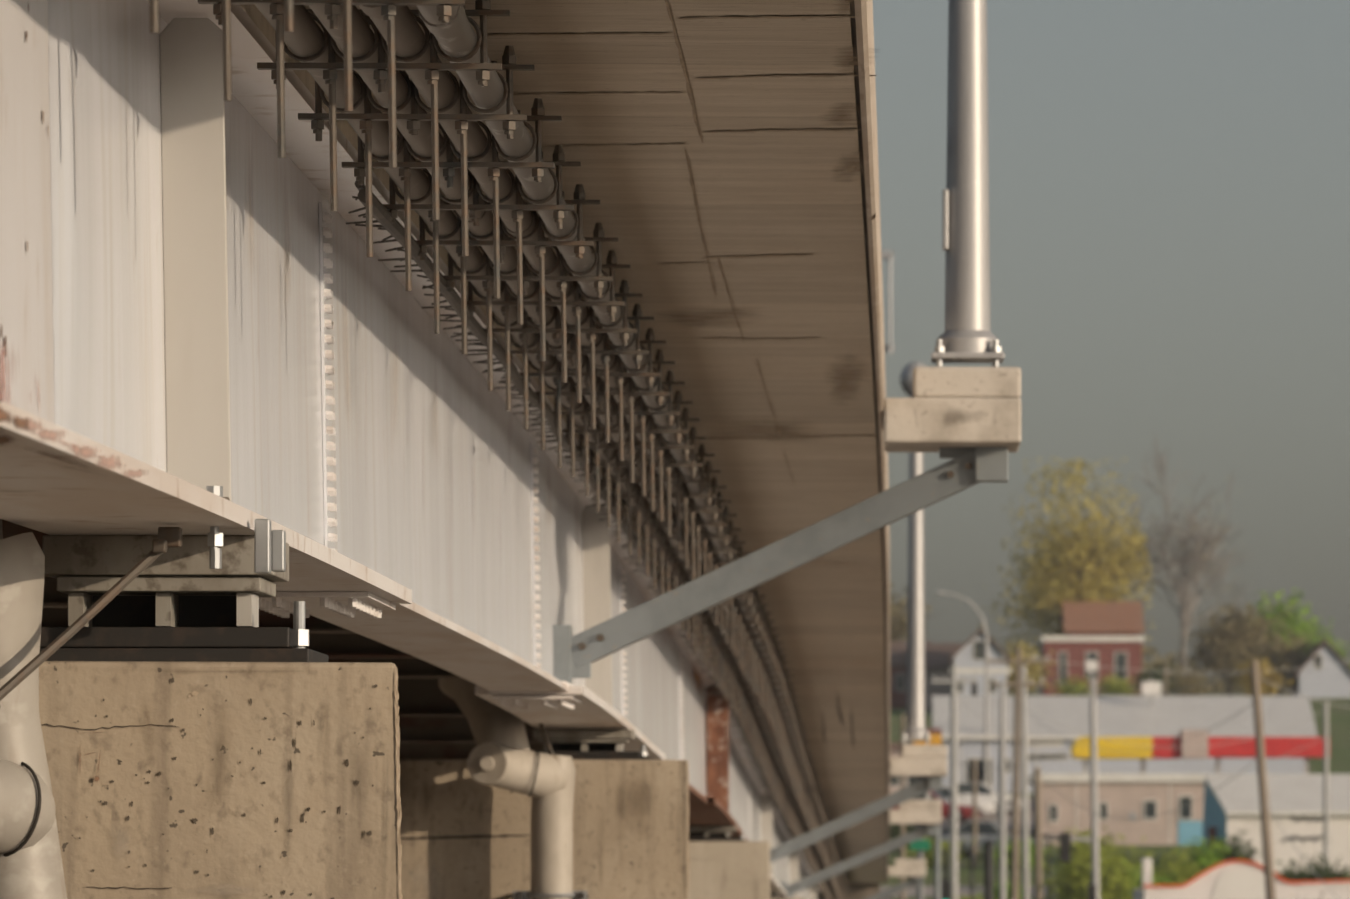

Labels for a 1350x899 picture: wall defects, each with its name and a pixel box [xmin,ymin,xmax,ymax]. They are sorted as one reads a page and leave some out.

corrosion [0,352,142,478]